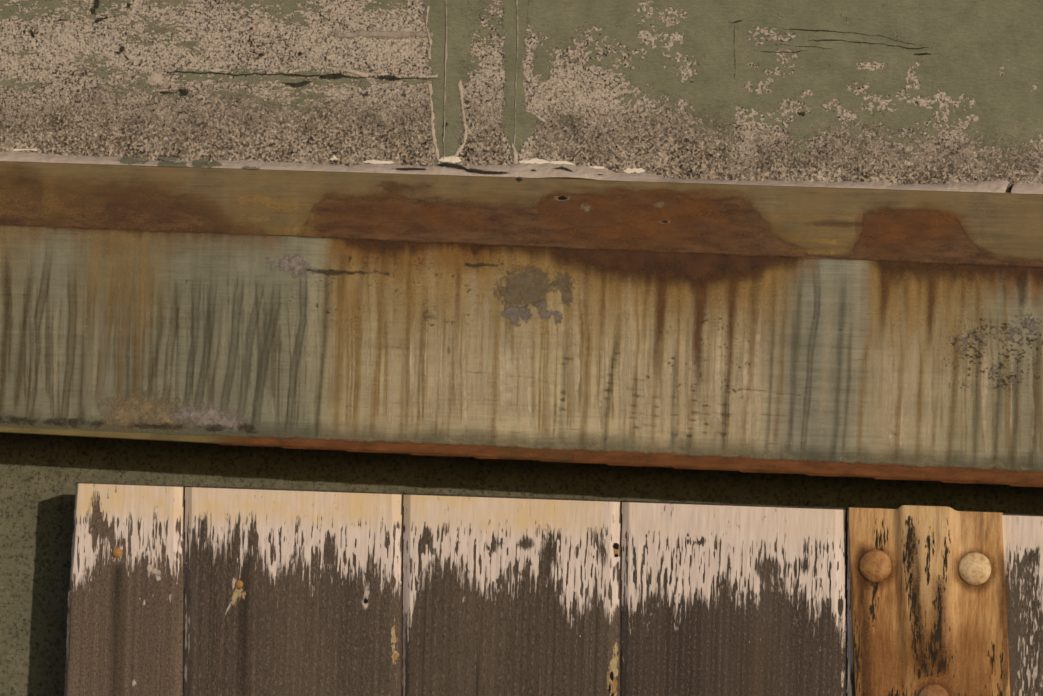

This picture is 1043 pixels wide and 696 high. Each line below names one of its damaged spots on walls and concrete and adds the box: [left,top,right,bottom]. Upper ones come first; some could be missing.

peeling [0,0,1043,193]
leakage [0,275,48,411]
peeling [267,254,389,277]
peeling [495,266,574,326]
leakage [326,238,784,459]
rust [299,182,1043,367]
leakage [871,260,978,367]
leakage [977,347,1020,452]
peeling [70,483,854,696]
rust [956,552,994,589]
peeling [1002,515,1043,615]